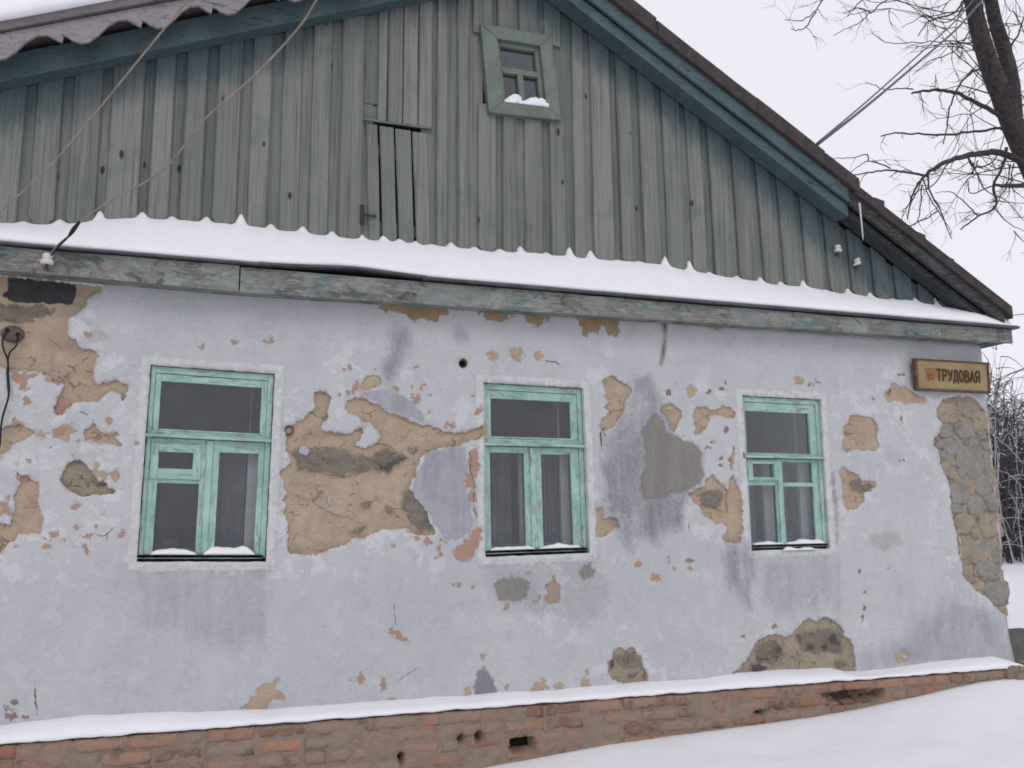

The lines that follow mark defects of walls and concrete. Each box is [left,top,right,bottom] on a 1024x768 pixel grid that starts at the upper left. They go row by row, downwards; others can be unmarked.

peeling [0,276,140,511]
peeling [599,376,632,431]
peeling [871,373,925,425]
peeling [843,415,879,452]
peeling [0,459,98,555]
peeling [279,364,488,562]
peeling [688,441,745,543]
peeling [839,467,875,510]
flaking render [934,396,1010,616]
spalling [608,647,647,683]
spalling [734,617,855,673]
peeling [240,677,285,710]